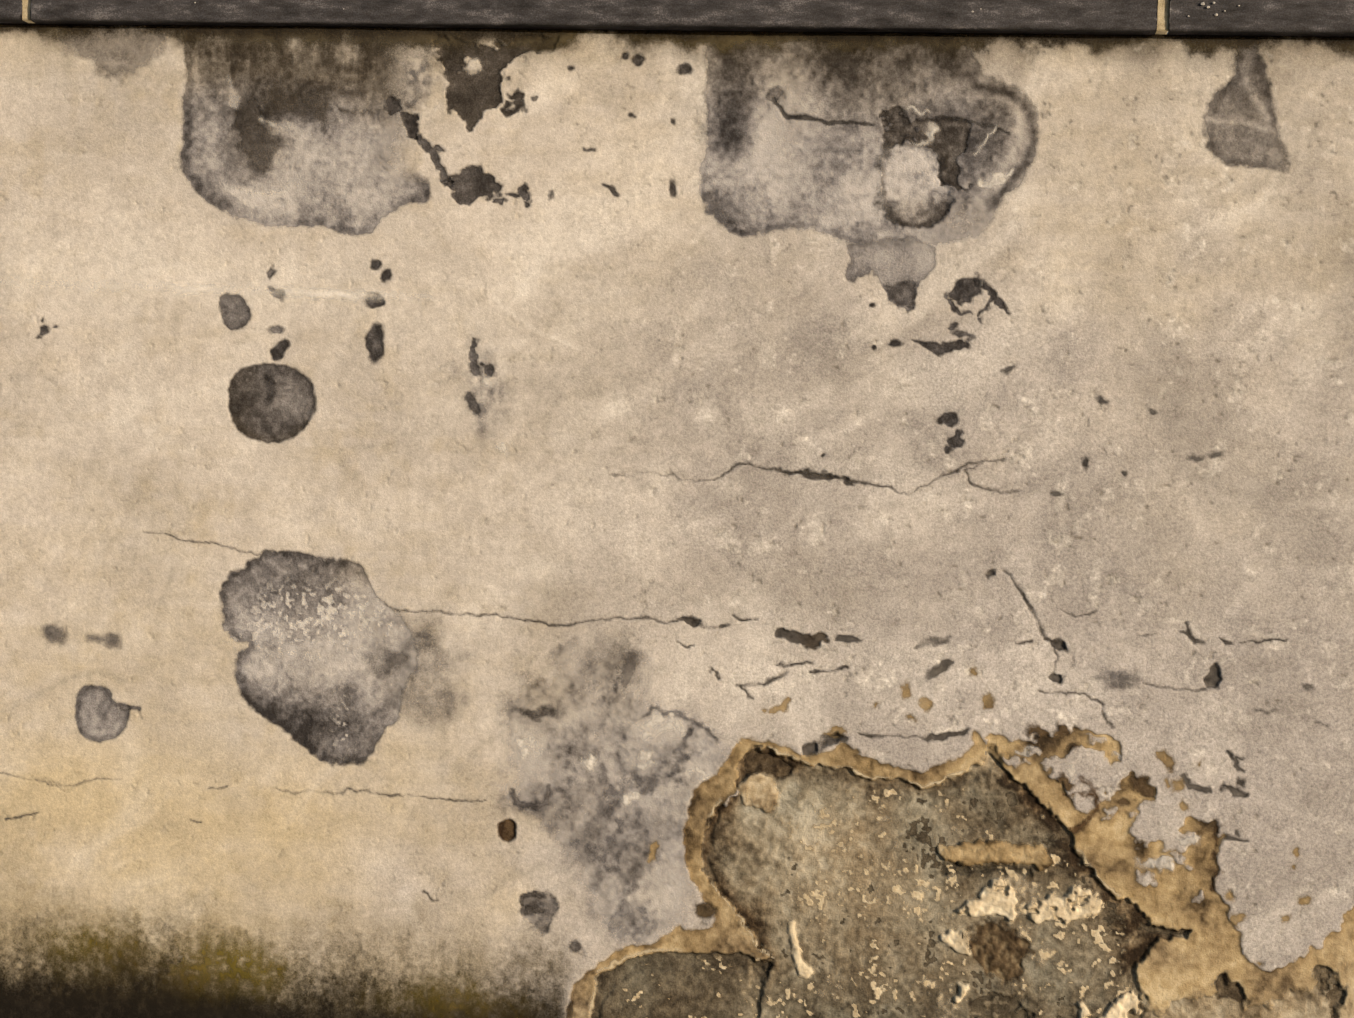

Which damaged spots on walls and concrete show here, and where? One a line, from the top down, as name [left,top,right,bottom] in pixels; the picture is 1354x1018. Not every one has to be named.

spalling [566,725,1354,1018]